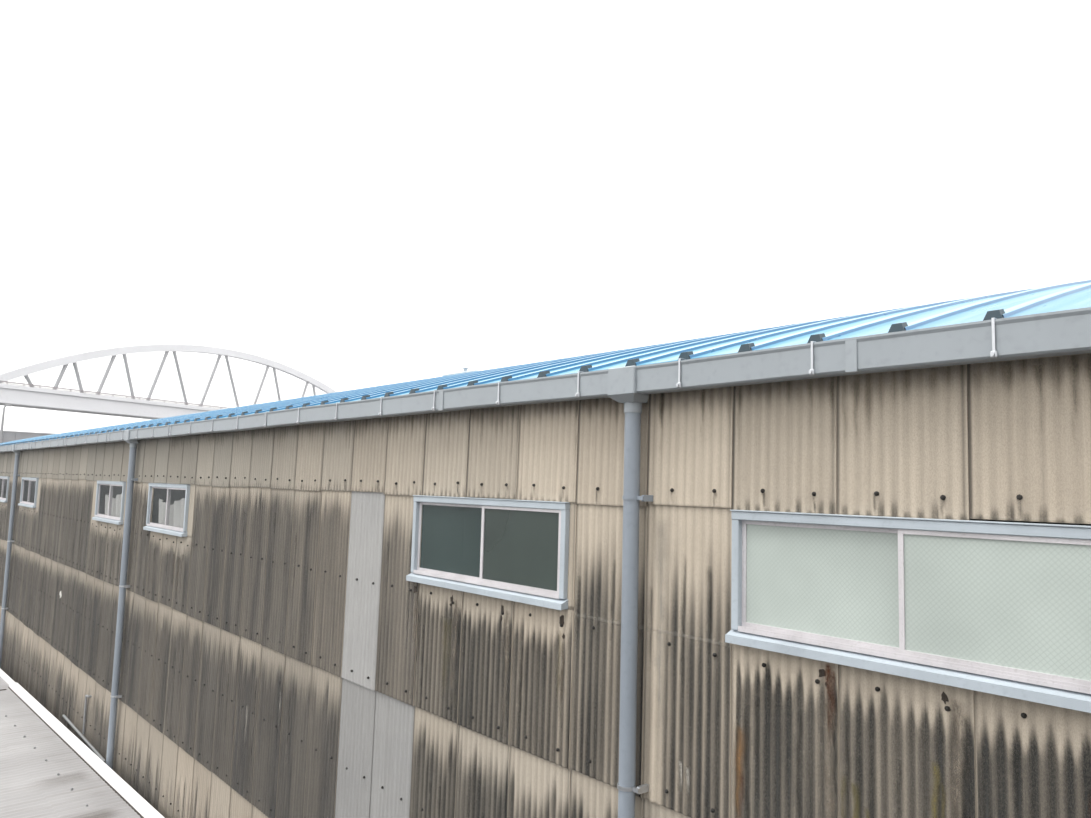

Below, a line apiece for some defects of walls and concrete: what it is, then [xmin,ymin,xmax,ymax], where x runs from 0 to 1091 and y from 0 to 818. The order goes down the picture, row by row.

damp [0,484,349,818]
damp [412,732,583,818]
damp [375,526,621,787]
damp [636,594,644,797]
damp [659,584,1091,818]